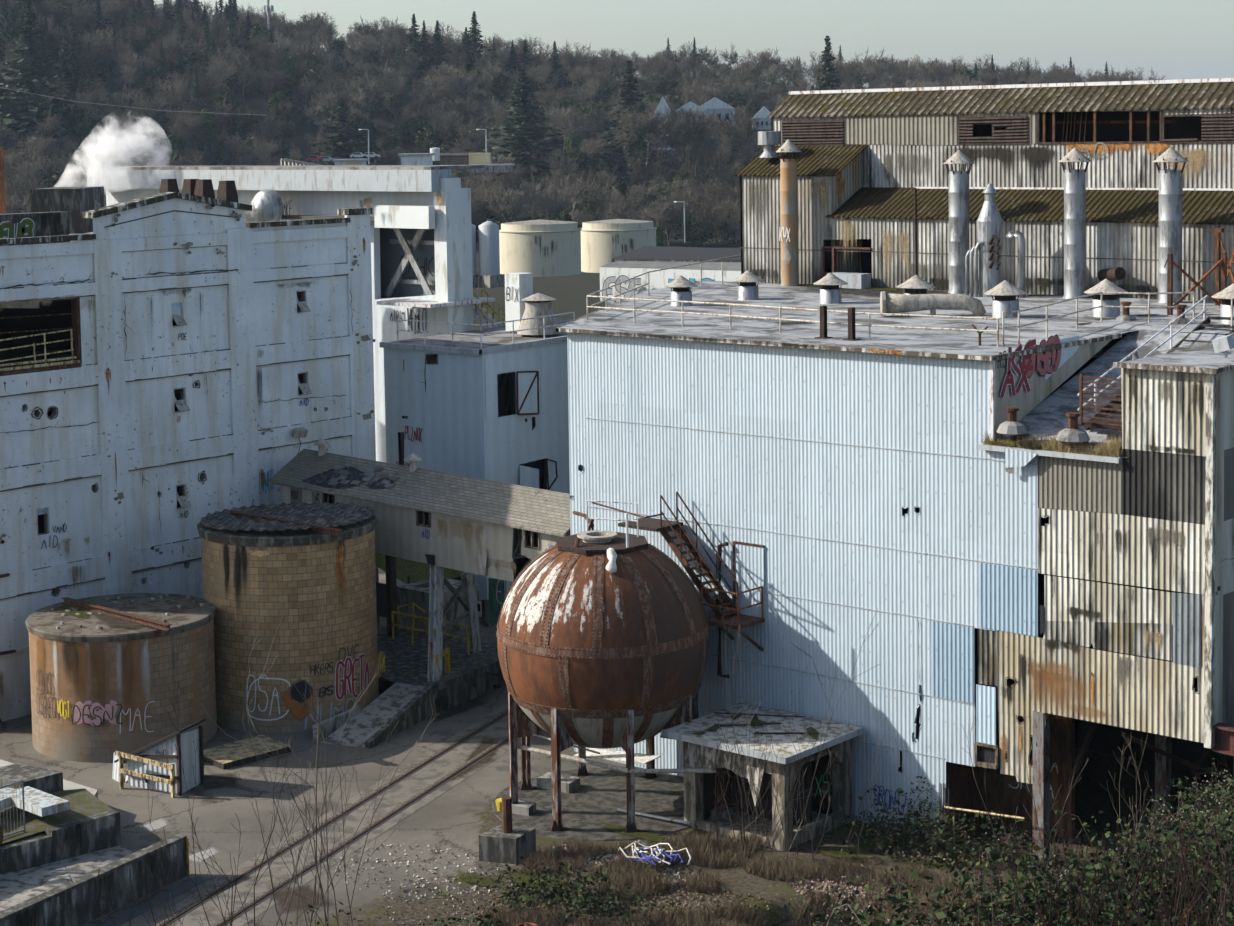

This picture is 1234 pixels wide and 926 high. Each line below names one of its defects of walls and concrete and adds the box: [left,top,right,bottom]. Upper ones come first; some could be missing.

water stain [1193,382,1221,417]
water stain [223,545,246,601]